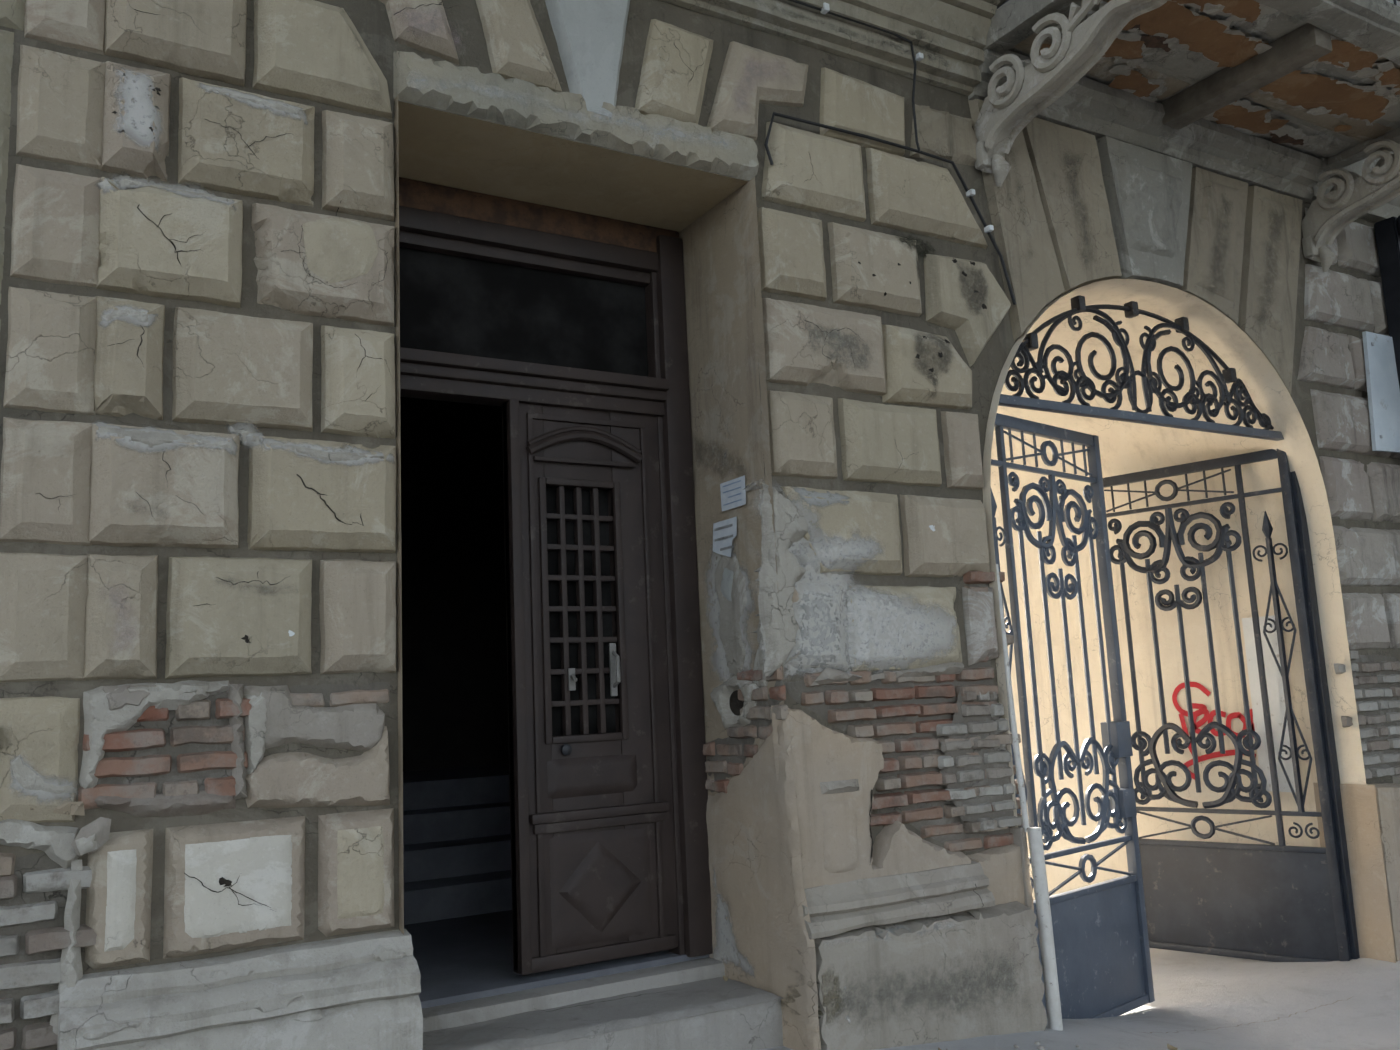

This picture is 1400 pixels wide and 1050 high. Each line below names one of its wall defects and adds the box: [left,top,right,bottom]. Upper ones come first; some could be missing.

crack [206,119,292,158]
peeling [1101,0,1278,103]
peeling [1203,35,1400,146]
crack [137,204,205,265]
crack [297,474,364,526]
flaking render [703,480,1025,852]
flaking render [1334,650,1400,781]
spalling [0,680,391,1050]
crack [184,873,274,911]
flaking render [714,873,754,975]